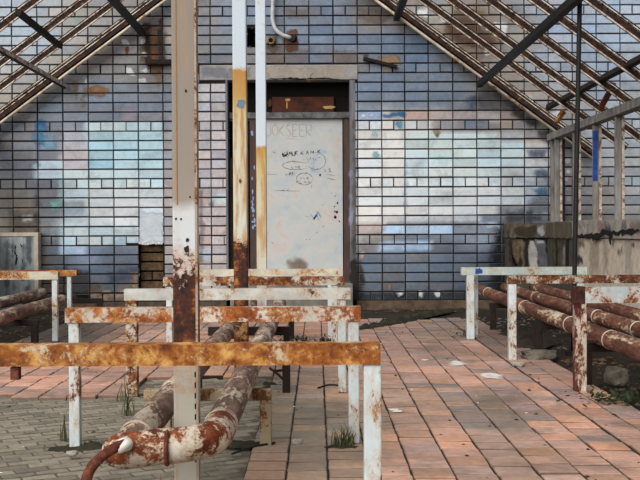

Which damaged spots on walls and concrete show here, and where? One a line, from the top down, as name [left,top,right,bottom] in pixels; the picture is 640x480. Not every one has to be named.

water stain [288,259,306,269]